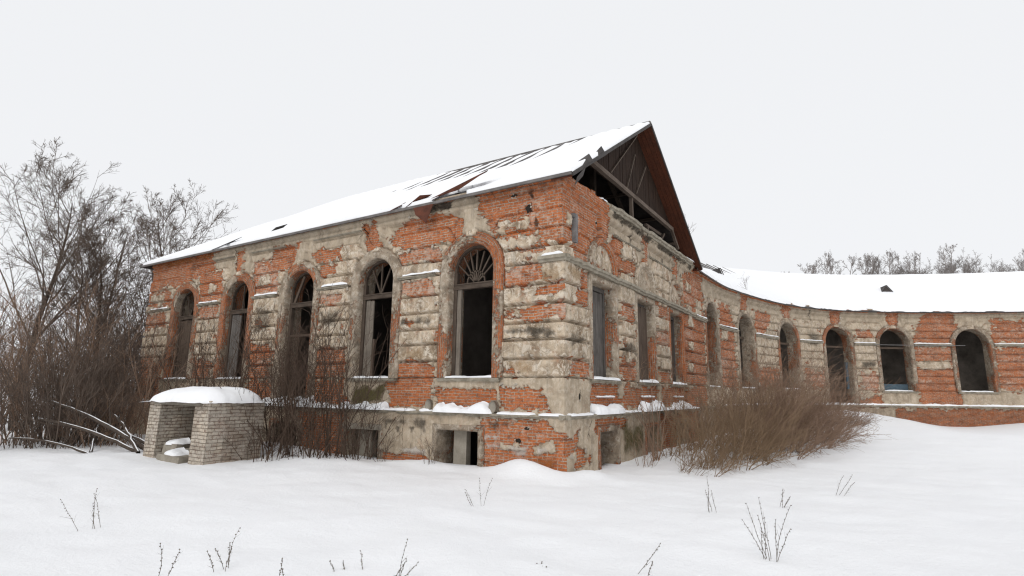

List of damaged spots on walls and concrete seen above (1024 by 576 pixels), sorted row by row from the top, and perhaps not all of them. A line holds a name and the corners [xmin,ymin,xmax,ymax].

flaking render [146,253,225,332]
flaking render [310,245,344,279]
flaking render [361,213,464,265]
flaking render [381,358,592,472]
flaking render [474,177,648,323]
flaking render [566,256,707,449]
flaking render [717,295,791,389]
flaking render [896,313,1024,427]